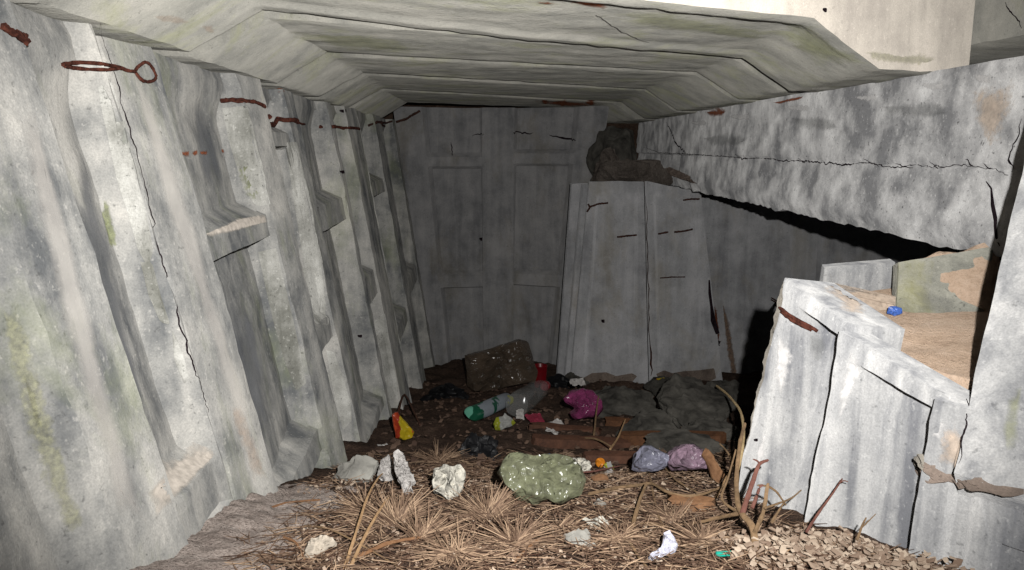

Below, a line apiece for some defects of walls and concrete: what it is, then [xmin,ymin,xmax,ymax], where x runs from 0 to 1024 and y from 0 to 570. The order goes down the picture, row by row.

crack [101,36,168,277]
spalling [665,167,697,184]
crack [643,119,1022,246]
crack [176,305,209,412]
spalling [913,454,1024,497]